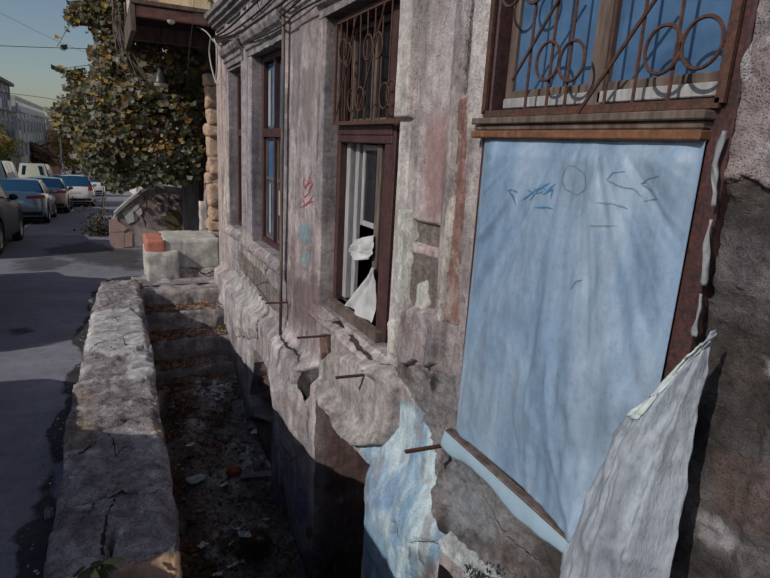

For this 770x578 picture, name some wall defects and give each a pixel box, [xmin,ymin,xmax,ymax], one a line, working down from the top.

crack [73,489,162,566]
spalling [237,251,290,322]
spalling [297,96,562,578]
spalling [670,177,770,578]